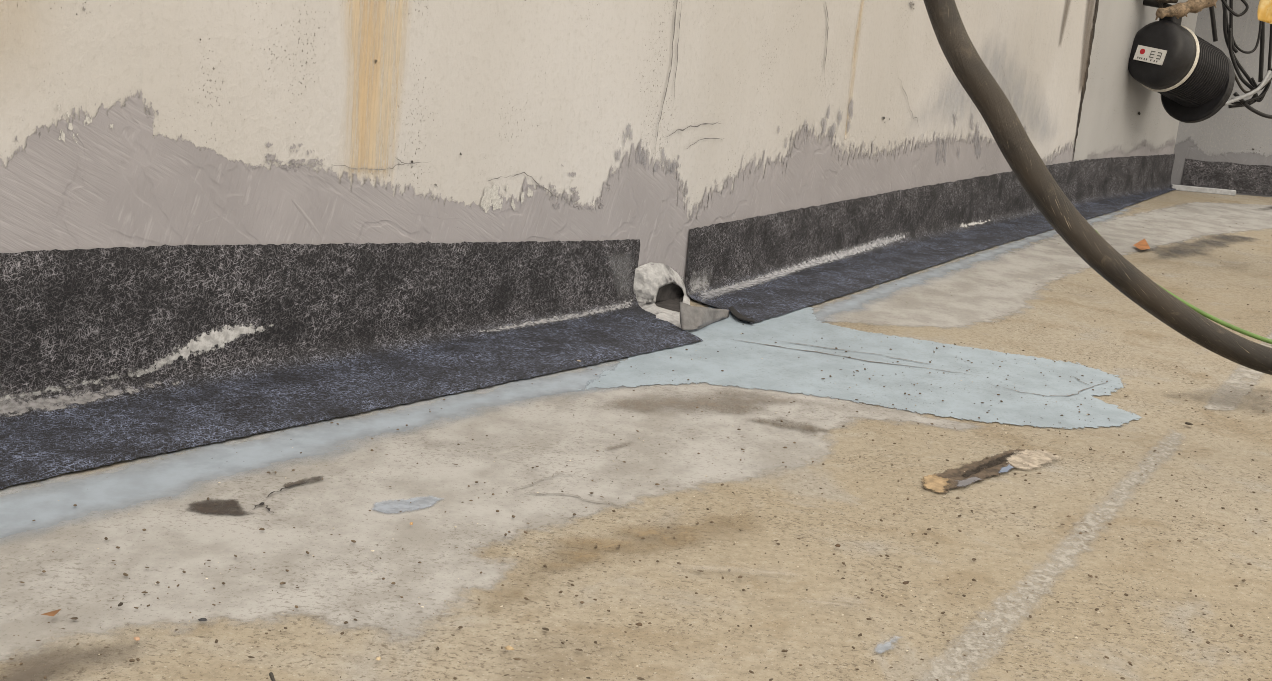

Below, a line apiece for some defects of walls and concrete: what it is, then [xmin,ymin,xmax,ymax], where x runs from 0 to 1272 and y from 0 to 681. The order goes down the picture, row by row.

crack [655,0,720,149]